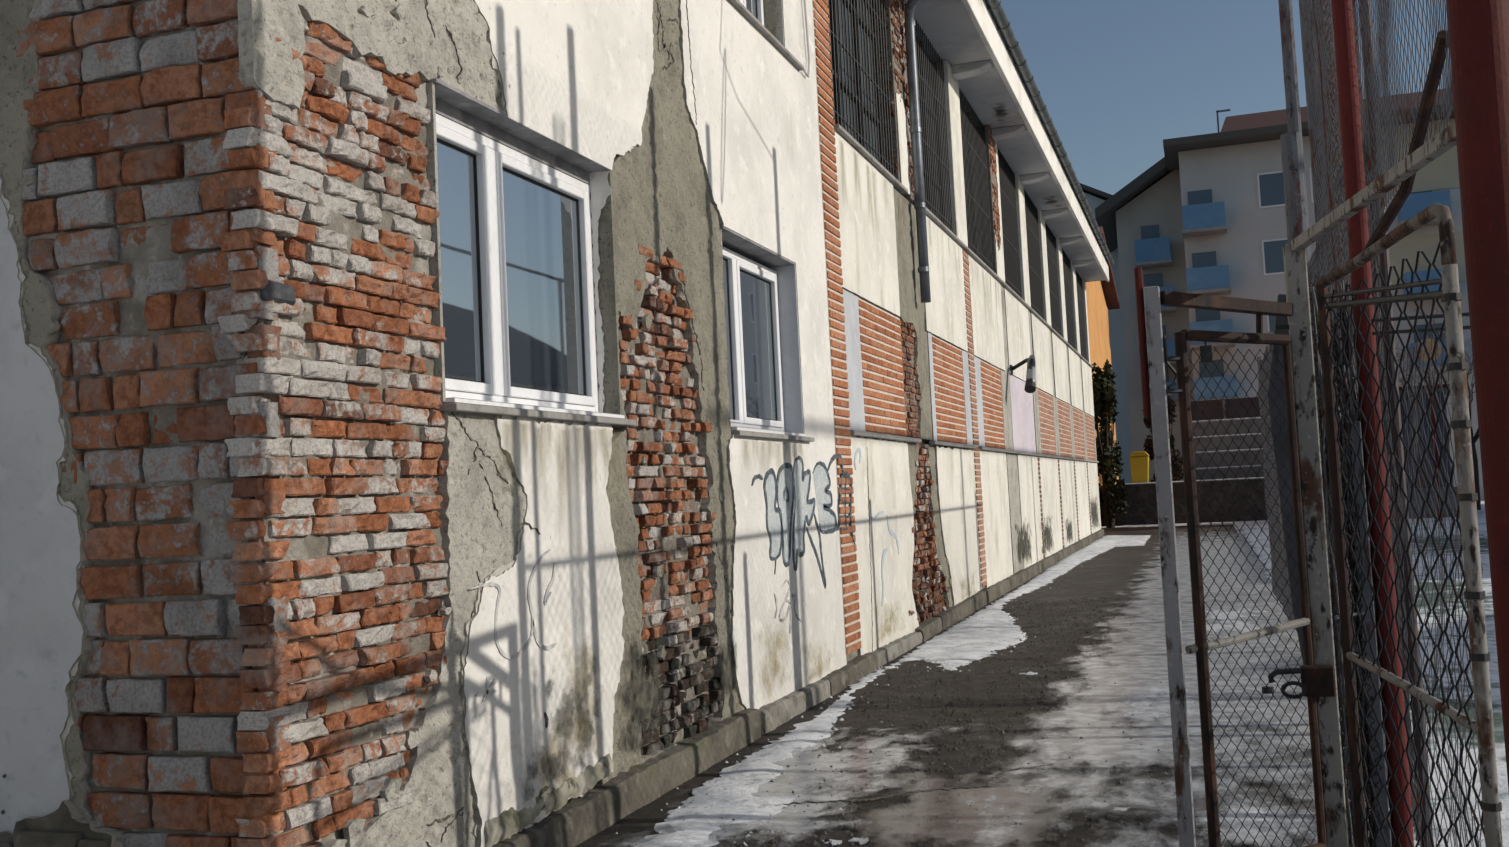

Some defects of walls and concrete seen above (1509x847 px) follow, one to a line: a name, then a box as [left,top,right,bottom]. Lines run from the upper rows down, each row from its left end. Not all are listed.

spalling [0,0,526,847]
crack [395,0,463,84]
water stain [525,660,599,798]
spalling [589,0,745,785]
crack [655,0,697,125]
spalling [878,0,953,632]